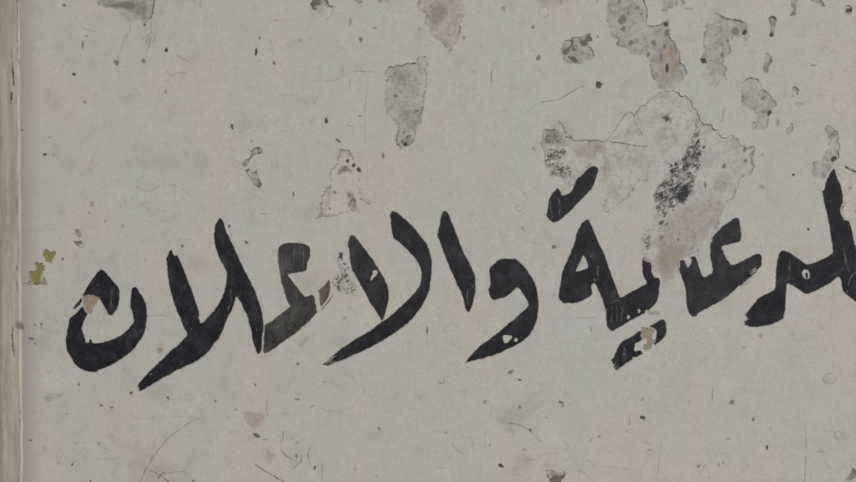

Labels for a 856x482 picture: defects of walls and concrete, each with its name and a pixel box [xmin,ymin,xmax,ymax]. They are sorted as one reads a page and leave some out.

peeling [98,0,155,27]
peeling [310,0,341,10]
peeling [416,0,465,53]
peeling [243,139,263,189]
peeling [314,138,372,220]
peeling [384,56,429,150]
peeling [532,0,764,285]
peeling [741,53,794,136]
peeling [812,125,856,221]
peeling [28,249,64,286]